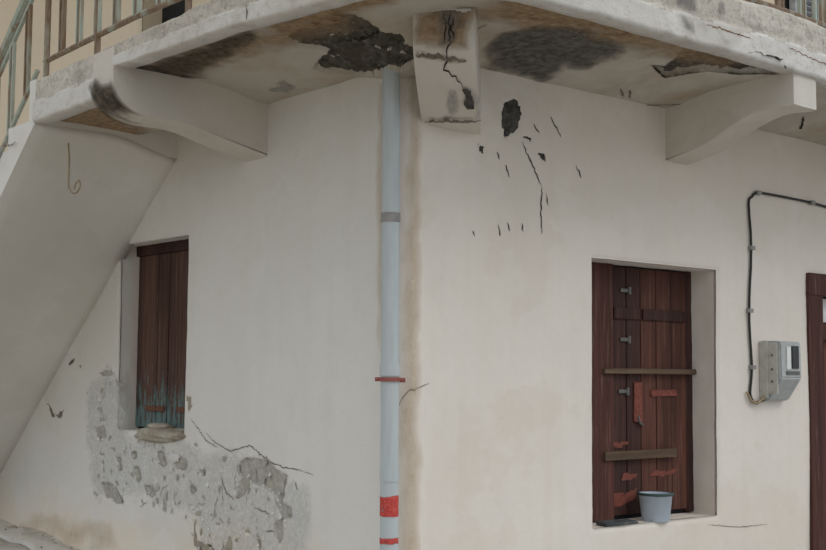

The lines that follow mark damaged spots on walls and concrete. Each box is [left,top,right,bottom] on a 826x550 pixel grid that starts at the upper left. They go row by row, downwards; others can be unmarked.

spalling [289,14,414,72]
crack [416,10,466,87]
water stain [417,8,472,45]
water stain [488,27,623,80]
spalling [660,51,765,71]
crack [425,116,481,124]
peeling [501,99,521,138]
flaking render [94,367,229,550]
crack [191,420,312,532]
spalling [222,453,292,544]
spalling [224,517,262,550]